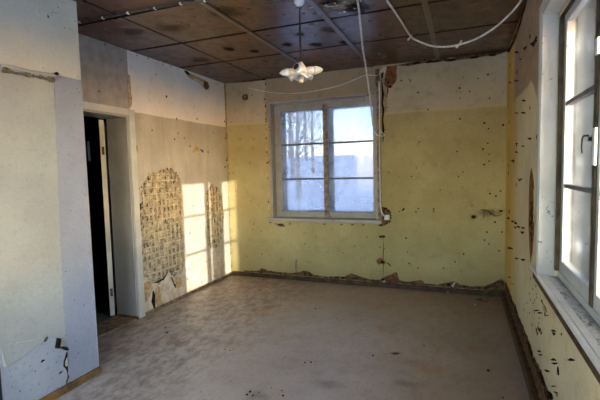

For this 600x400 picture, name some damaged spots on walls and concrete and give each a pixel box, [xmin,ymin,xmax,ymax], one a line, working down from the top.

peeling [184,70,209,90]
spalling [375,65,397,88]
flaking render [139,168,185,308]
flaking render [206,184,225,248]
spalling [378,207,392,226]
spalling [499,169,535,263]